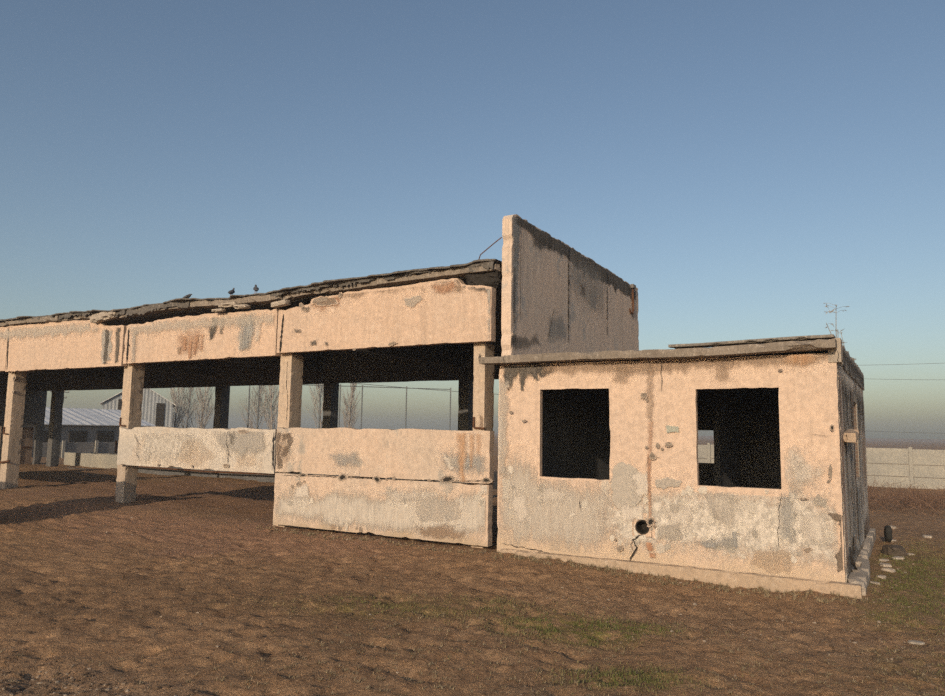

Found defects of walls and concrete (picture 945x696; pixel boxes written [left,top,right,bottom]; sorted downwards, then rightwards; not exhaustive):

damp [511,216,632,344]
peeling [275,382,843,572]
damp [843,351,870,573]